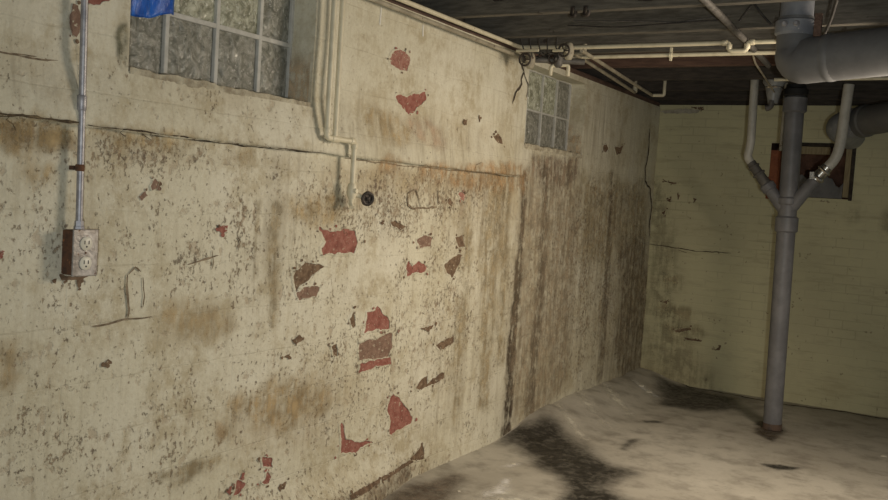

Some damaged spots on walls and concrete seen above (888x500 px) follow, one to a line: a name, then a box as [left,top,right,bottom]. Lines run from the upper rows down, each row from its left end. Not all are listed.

spalling [387,47,411,74]
spalling [394,89,429,117]
crack [0,113,524,176]
crack [645,131,725,253]
spalling [291,225,366,302]
spalling [328,342,339,363]
spalling [348,305,400,374]
spalling [411,371,445,392]
water stain [480,157,625,500]
water stain [616,242,732,409]
spalling [335,421,373,459]
spalling [385,392,418,437]